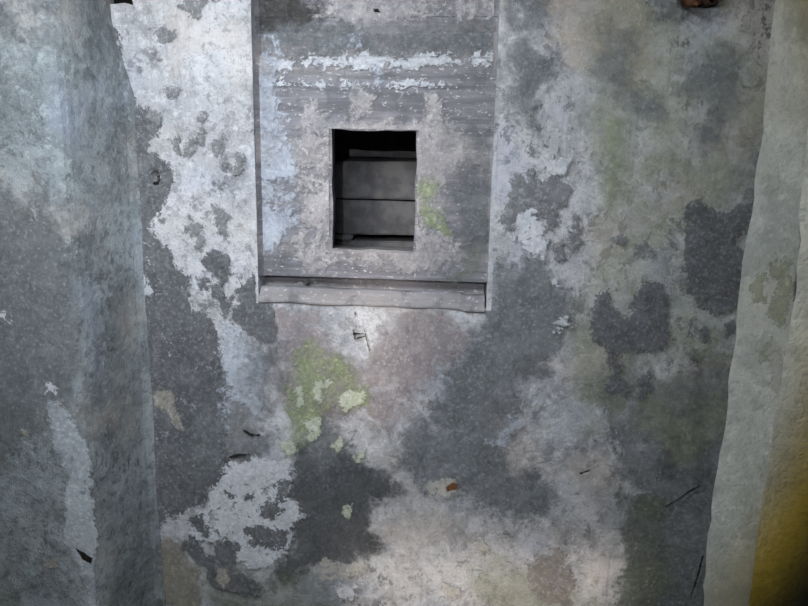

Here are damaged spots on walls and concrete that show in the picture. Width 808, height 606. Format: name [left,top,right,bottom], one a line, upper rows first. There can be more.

damp [175,257,581,585]